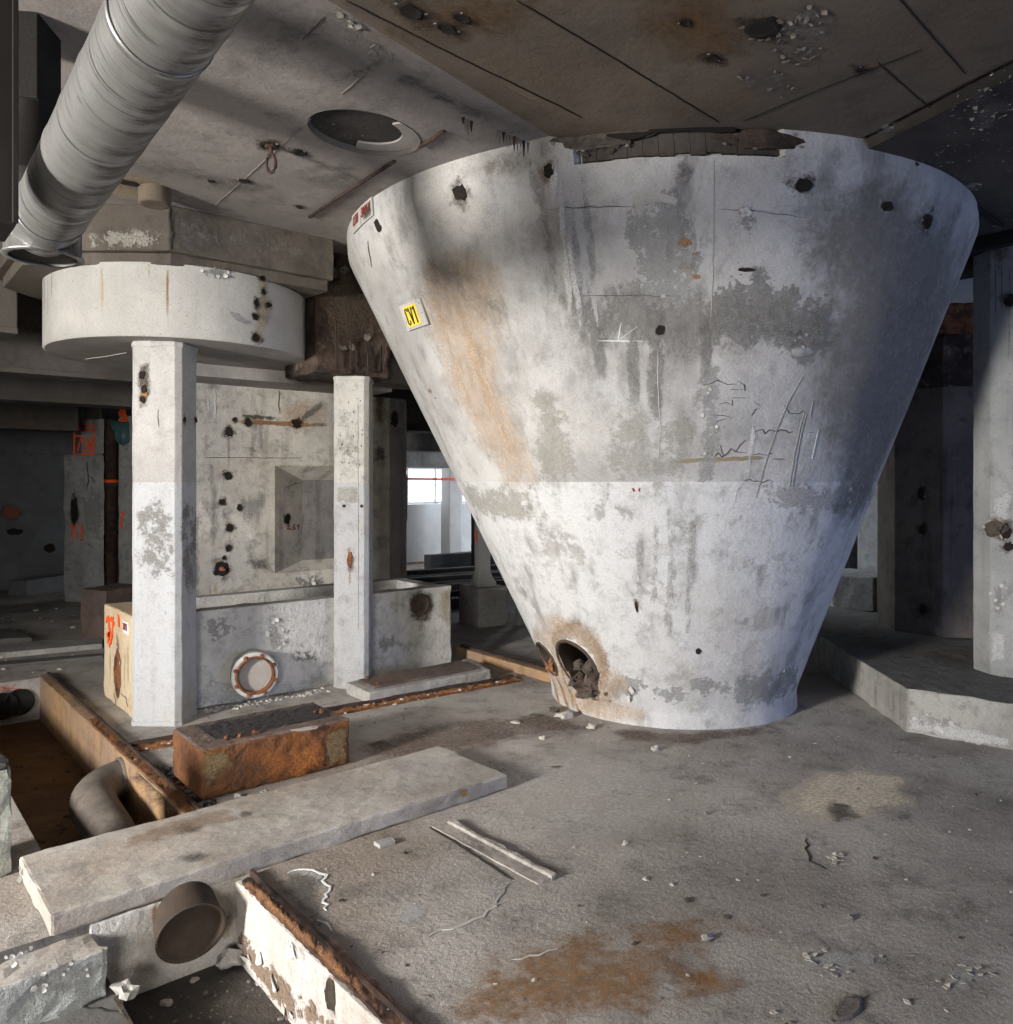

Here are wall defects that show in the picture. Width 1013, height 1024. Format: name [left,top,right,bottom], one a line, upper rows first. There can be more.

spalling [549,129,656,158]
spalling [711,128,806,151]
spalling [231,275,273,343]
damp [550,167,828,487]
rust [241,404,324,427]
crack [669,380,811,483]
rust [534,620,638,720]
rust [89,715,233,847]
crack [804,838,827,870]
peeling [288,868,332,931]
peeling [238,934,336,1024]
rust [456,920,741,1019]